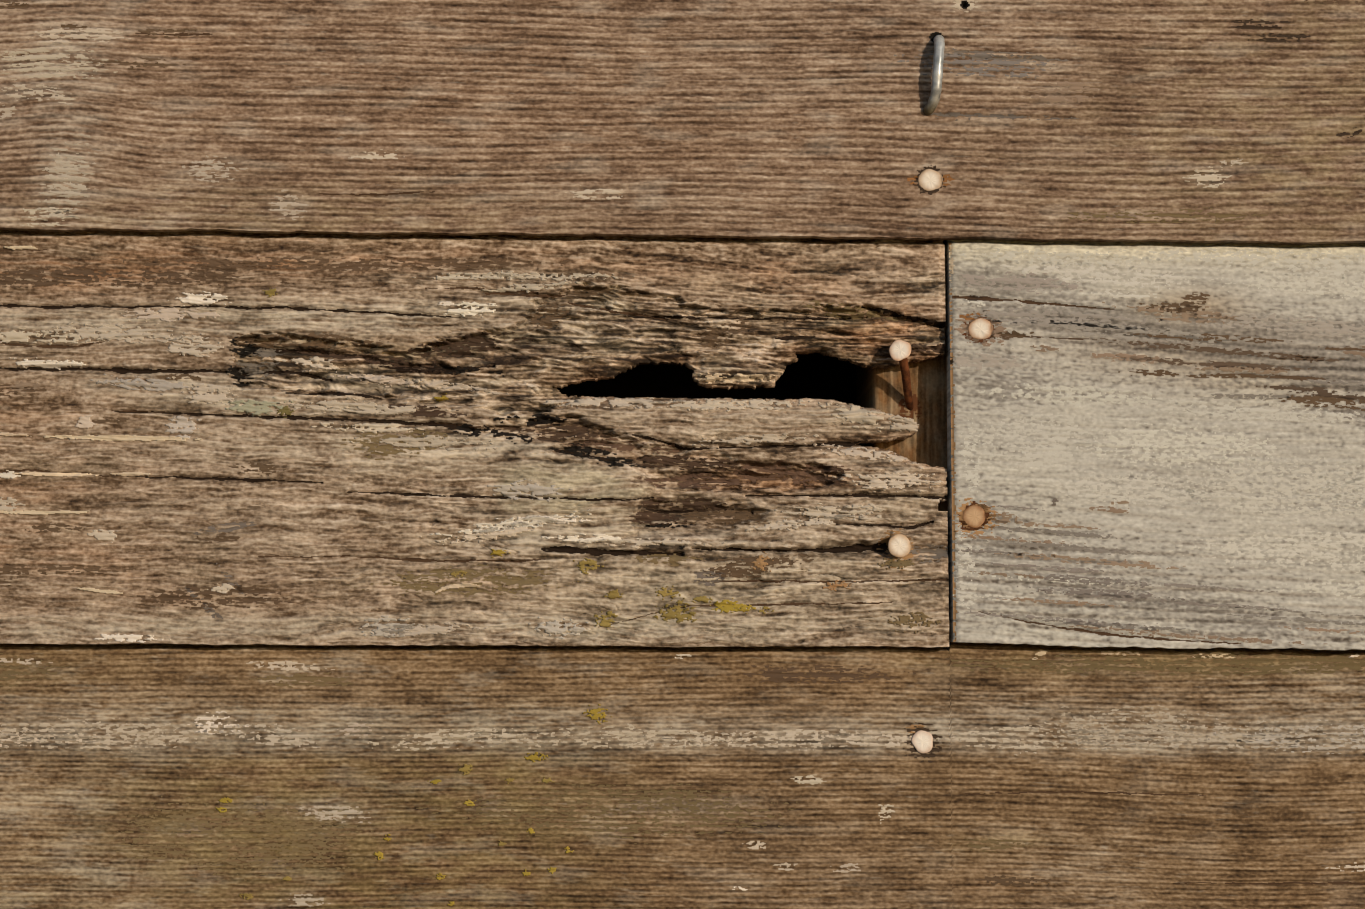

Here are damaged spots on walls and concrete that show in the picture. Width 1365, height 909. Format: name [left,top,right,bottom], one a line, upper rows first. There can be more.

crack [0,287,1114,341]
crack [0,341,496,429]